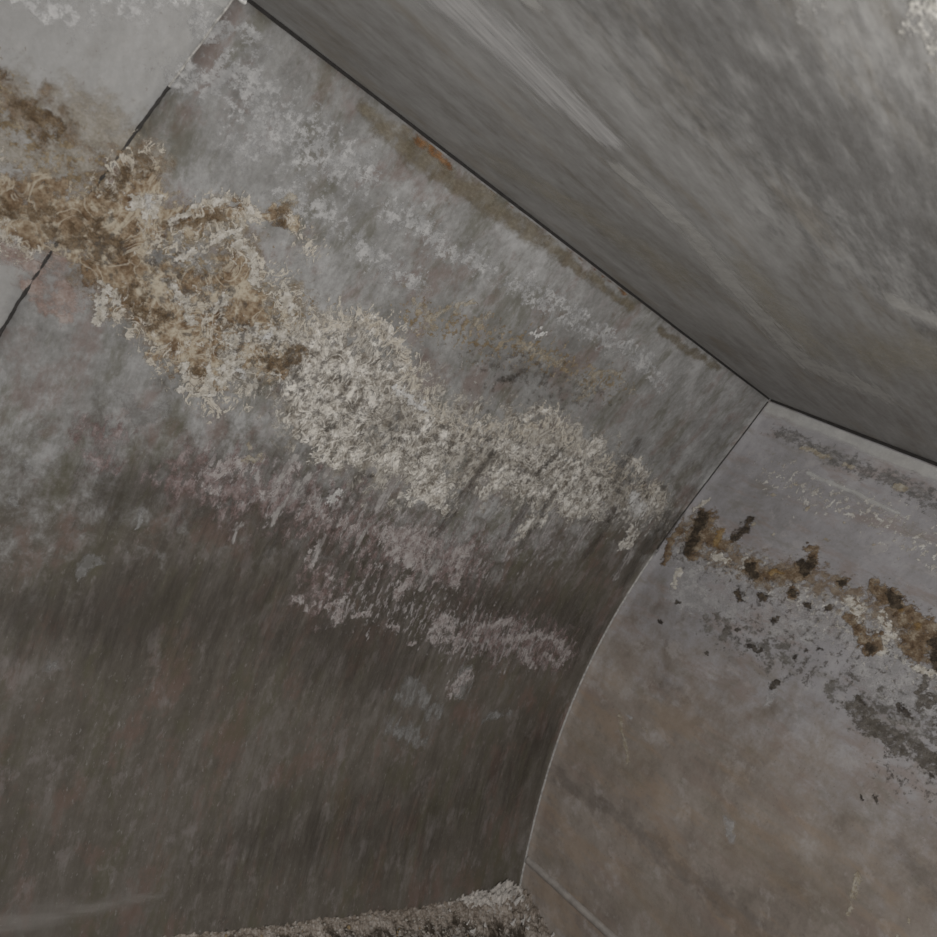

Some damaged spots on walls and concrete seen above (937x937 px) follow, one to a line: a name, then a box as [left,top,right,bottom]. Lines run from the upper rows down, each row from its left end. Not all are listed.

damp [659,0,937,299]
damp [0,0,682,698]
efflorescence [389,678,443,746]